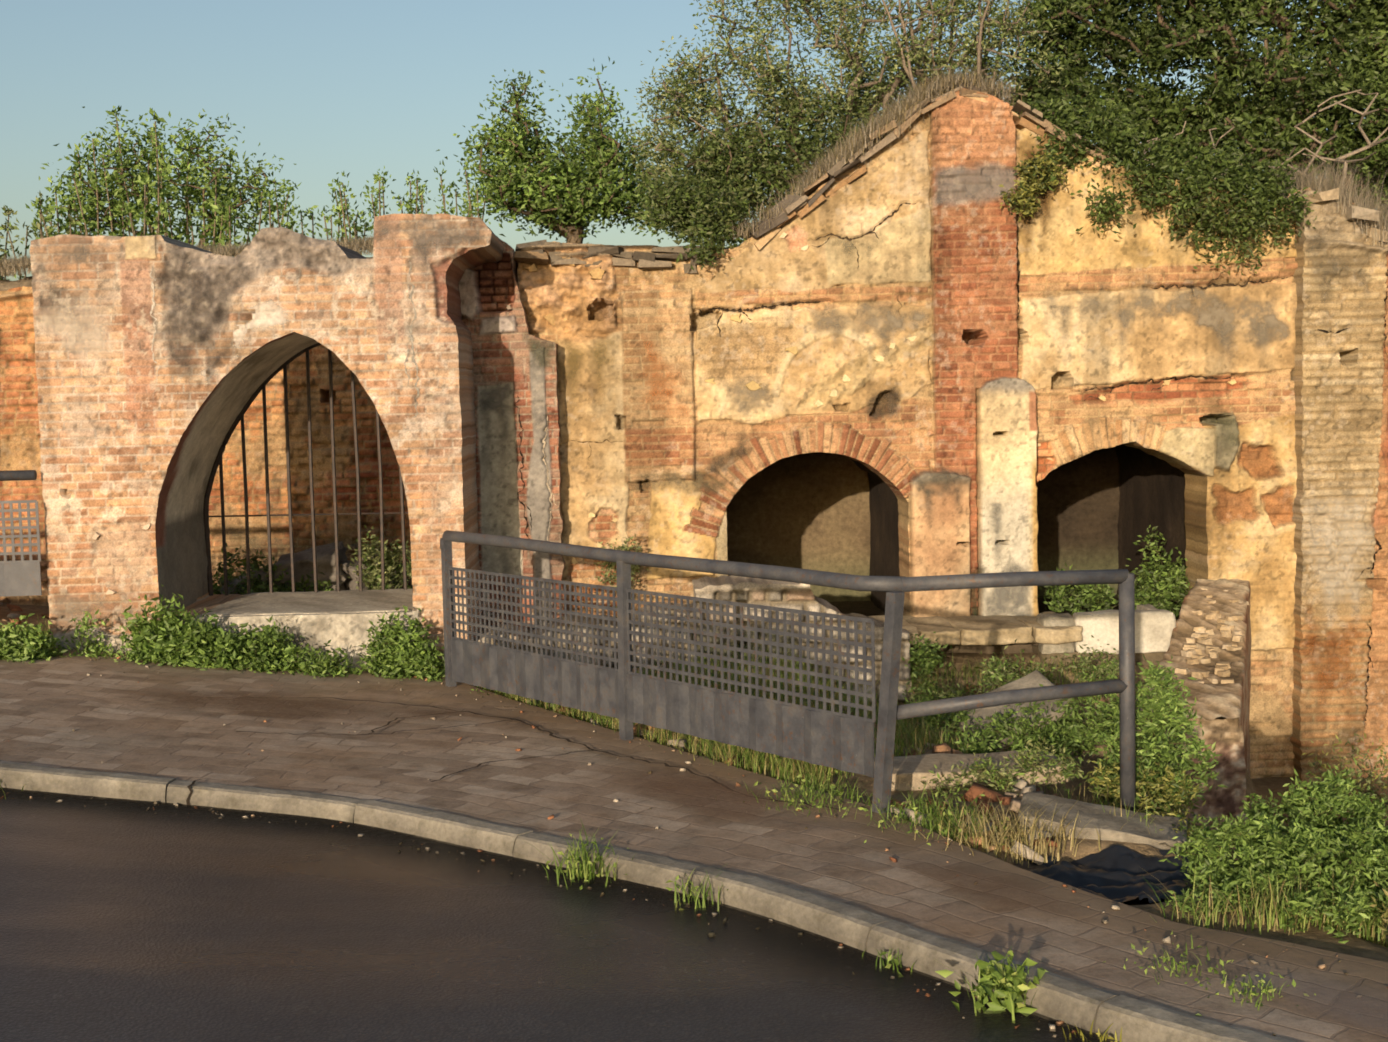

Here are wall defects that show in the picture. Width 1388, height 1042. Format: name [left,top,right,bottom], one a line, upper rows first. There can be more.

crack [812,203,916,269]
damp [233,301,286,344]
spalling [430,247,619,343]
spalling [1211,441,1296,529]
crack [186,779,202,805]